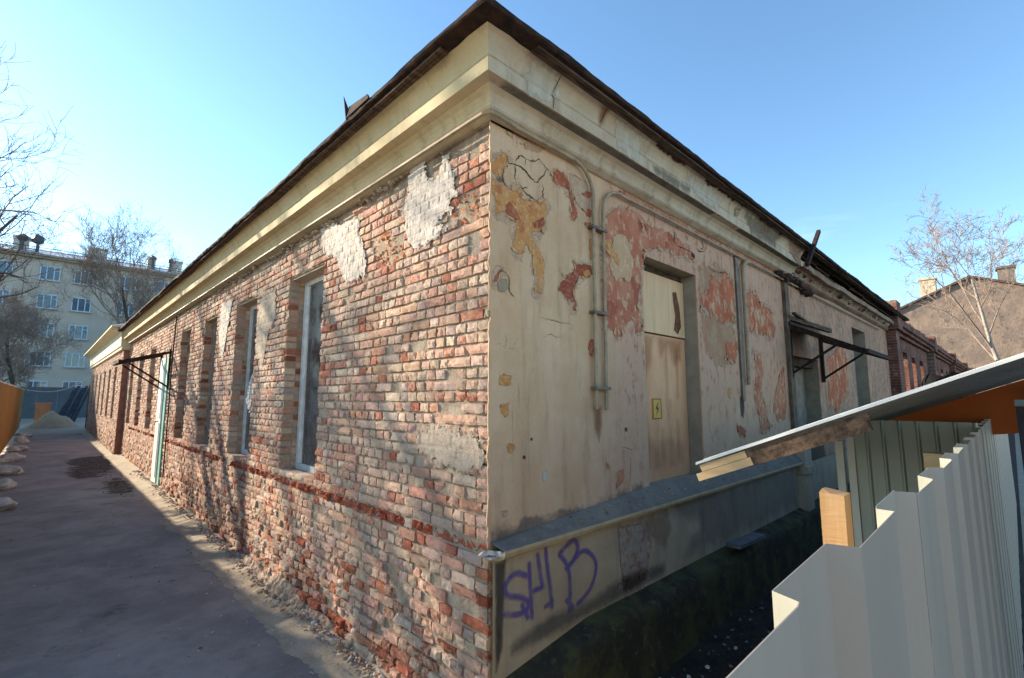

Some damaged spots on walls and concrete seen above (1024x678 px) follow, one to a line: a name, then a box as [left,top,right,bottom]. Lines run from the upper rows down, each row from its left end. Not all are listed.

crack [502,130,550,201]
peeling [449,150,551,299]
peeling [549,169,776,367]
peeling [499,374,512,386]
peeling [754,350,787,434]
peeling [826,347,848,413]